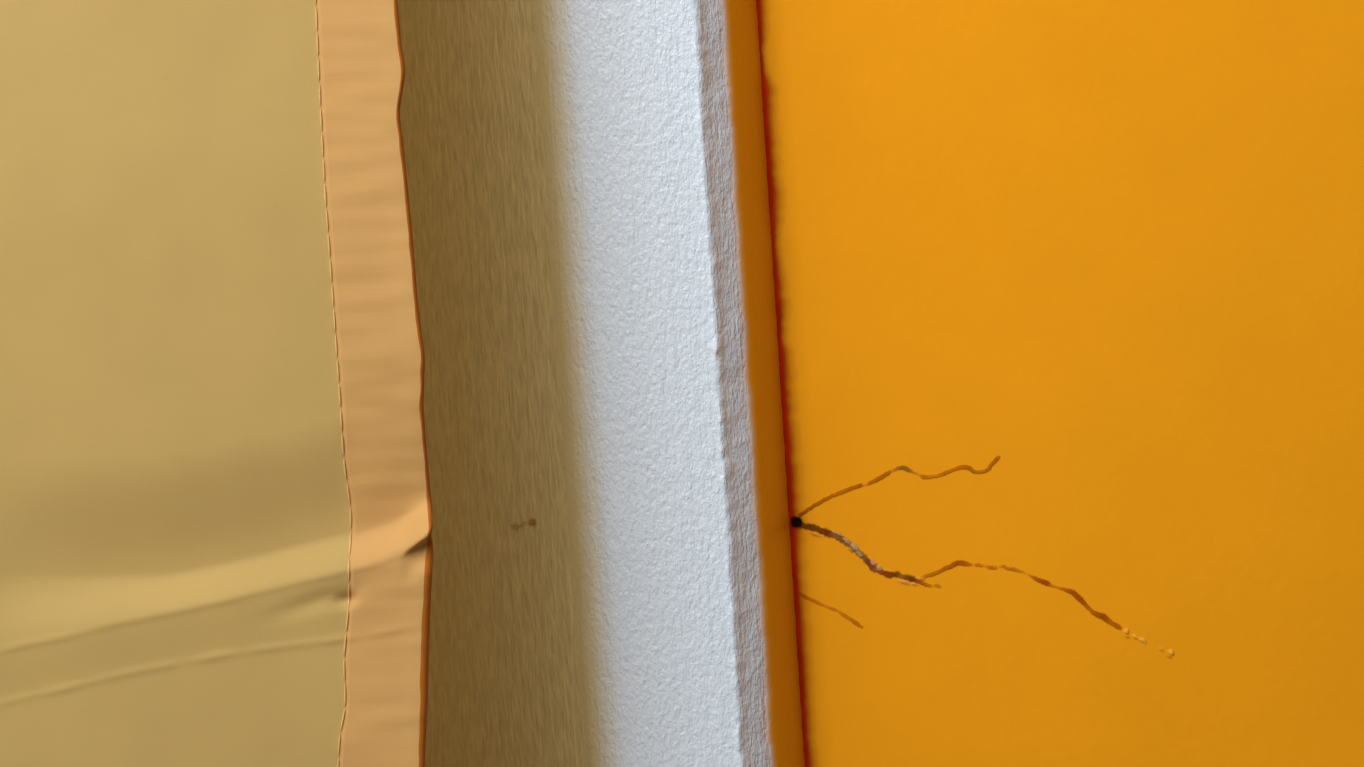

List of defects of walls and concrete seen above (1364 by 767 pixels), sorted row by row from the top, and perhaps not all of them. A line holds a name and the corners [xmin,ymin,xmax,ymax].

crack [756,0,1173,767]